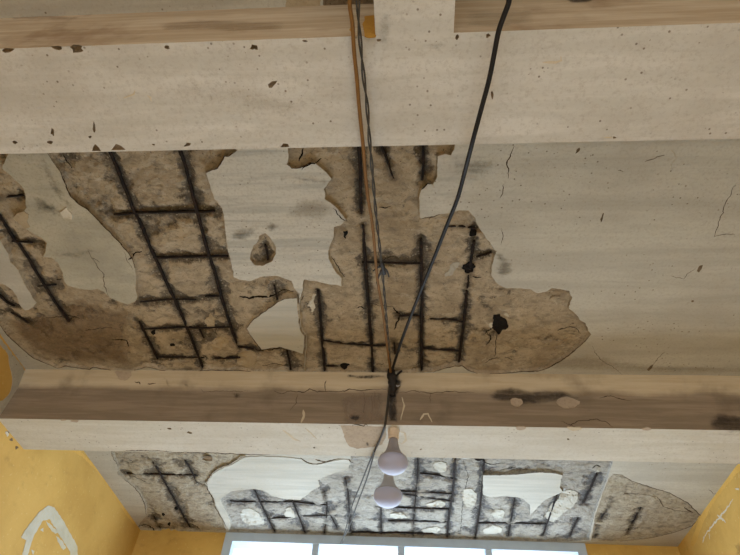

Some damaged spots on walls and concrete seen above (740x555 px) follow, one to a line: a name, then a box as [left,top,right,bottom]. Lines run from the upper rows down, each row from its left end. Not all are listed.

spalling [0,122,591,381]
crack [275,381,385,427]
leakage [494,389,568,403]
spalling [111,397,701,542]
crack [703,488,739,541]